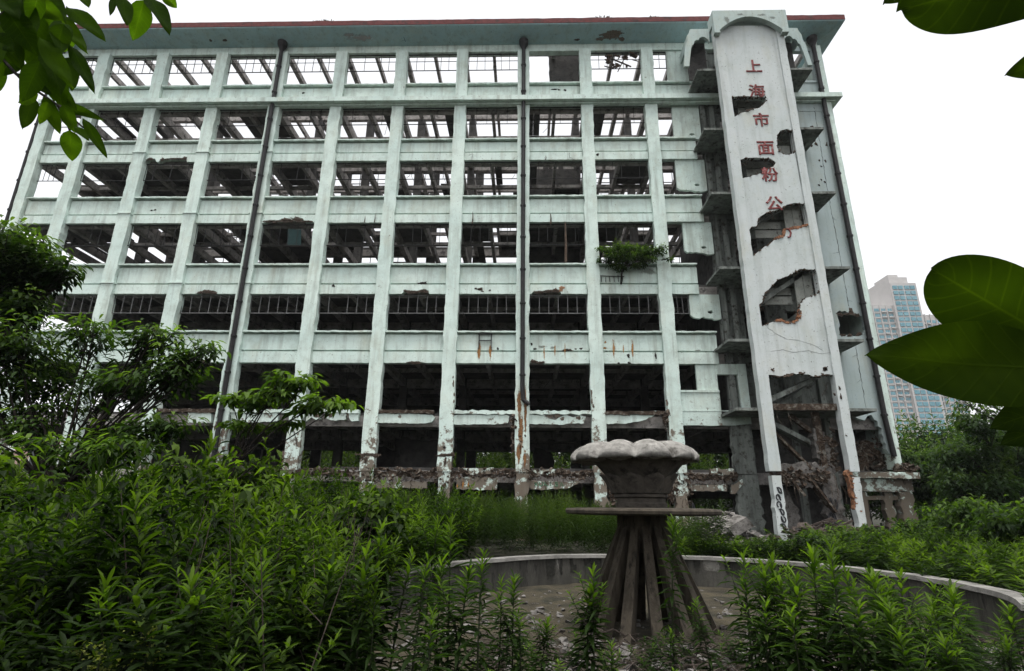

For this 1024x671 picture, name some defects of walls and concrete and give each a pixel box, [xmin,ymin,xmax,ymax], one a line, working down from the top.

spalling [741,129,796,177]
spalling [750,202,808,256]
spalling [759,268,820,326]
spalling [769,366,842,399]
rust [516,387,527,467]
flaking render [843,469,863,525]